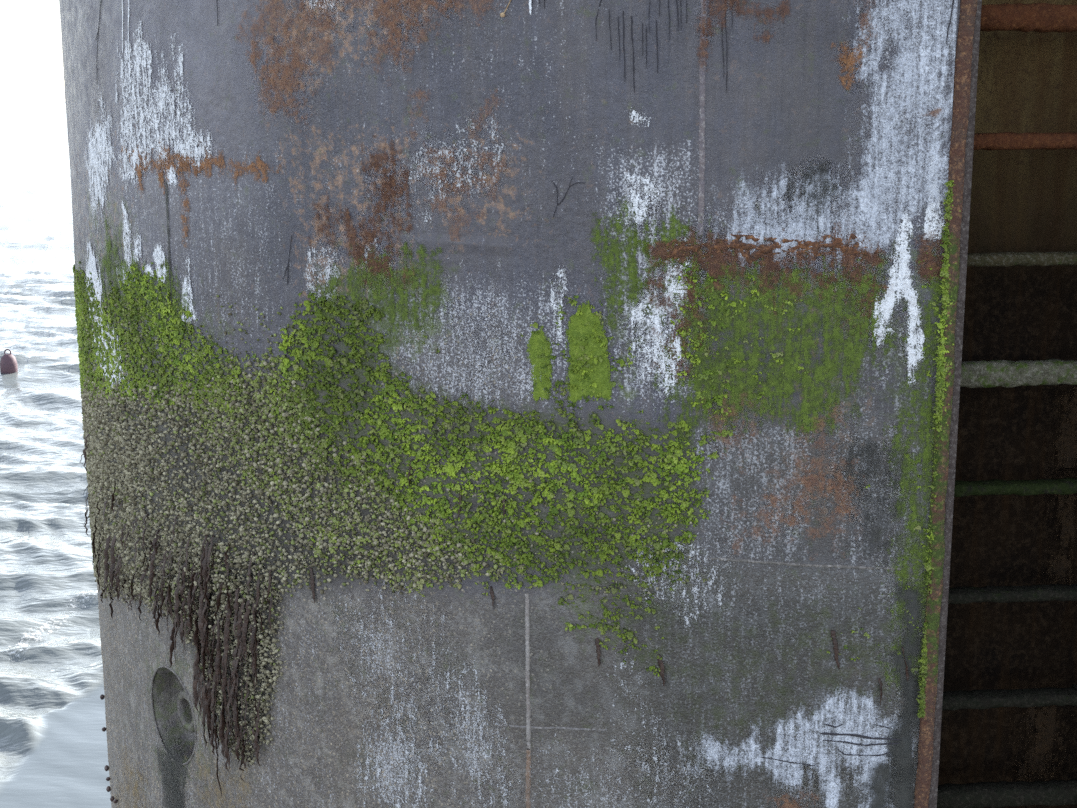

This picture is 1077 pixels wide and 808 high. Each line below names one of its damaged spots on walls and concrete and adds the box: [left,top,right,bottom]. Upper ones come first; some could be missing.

water stain [609,0,687,92]
water stain [157,182,172,341]
corrosion [121,143,280,247]
corrosion [308,140,411,288]
corrosion [648,225,889,377]